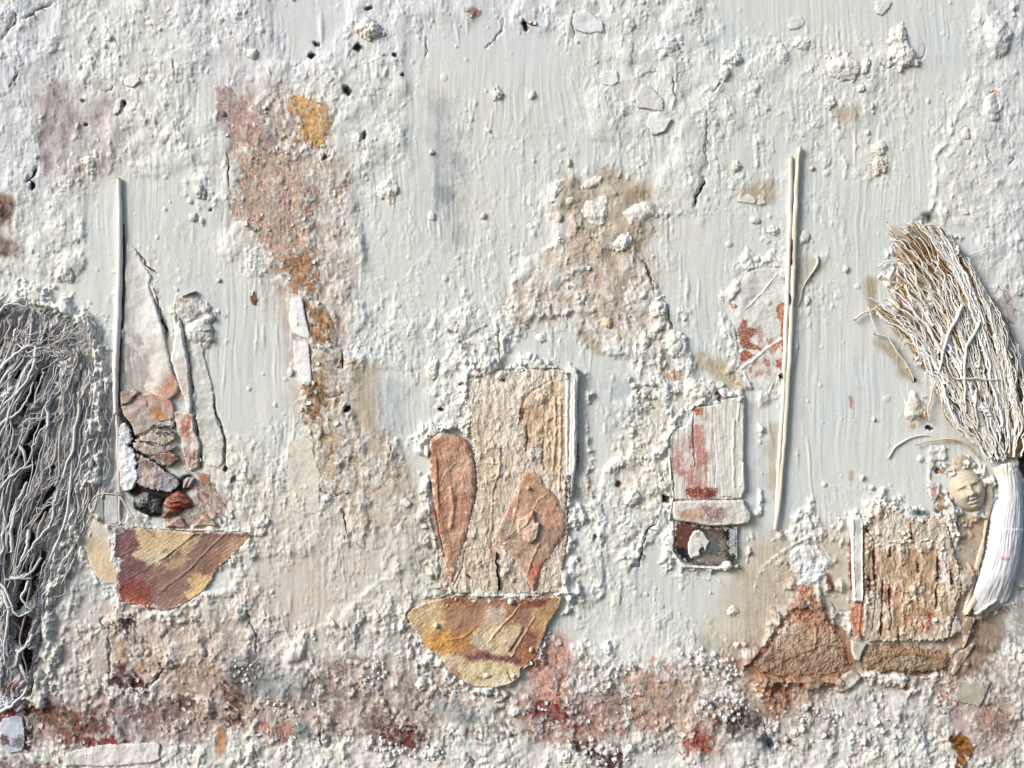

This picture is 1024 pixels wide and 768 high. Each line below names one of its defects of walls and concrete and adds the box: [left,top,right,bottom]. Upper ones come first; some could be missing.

crack [695,119,710,205]
crack [137,252,186,344]